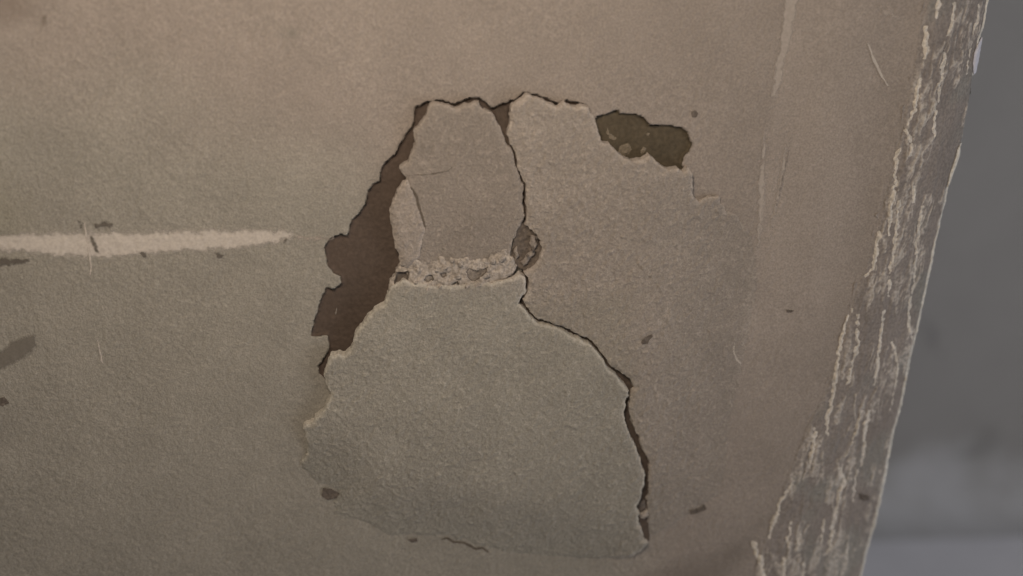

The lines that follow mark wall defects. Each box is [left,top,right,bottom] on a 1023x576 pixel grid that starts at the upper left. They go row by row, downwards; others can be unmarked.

crack [494,106,526,220]
peeling [300,92,757,559]
crack [519,270,650,541]
spalling [751,0,989,576]